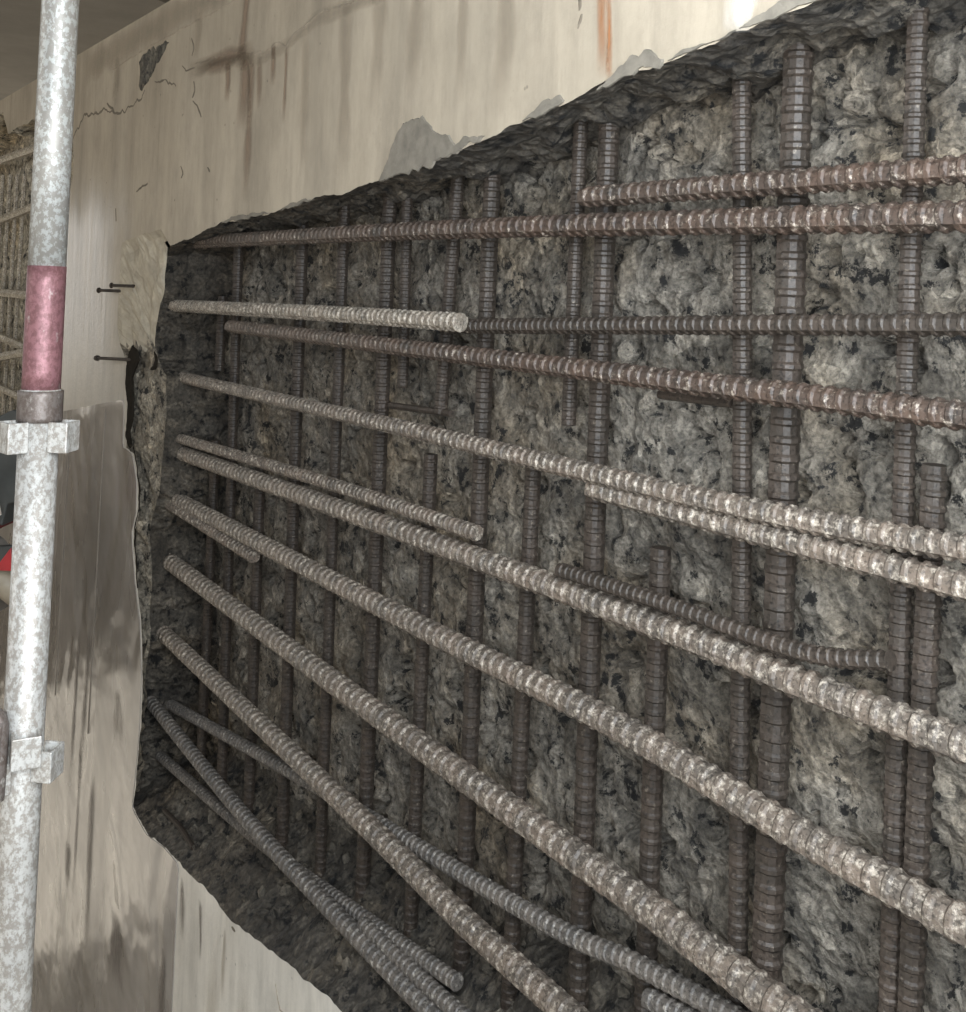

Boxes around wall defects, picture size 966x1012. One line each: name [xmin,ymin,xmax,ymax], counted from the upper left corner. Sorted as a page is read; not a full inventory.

corrosion [600,0,611,62]
crack [73,38,201,138]
spalling [495,236,569,319]
spalling [613,234,733,317]
spalling [804,232,900,315]
spalling [442,312,966,403]
spalling [608,384,733,494]
spalling [798,409,895,522]
spalling [555,482,966,735]
spalling [788,698,886,857]
spalling [928,755,966,902]
spalling [782,846,881,1012]